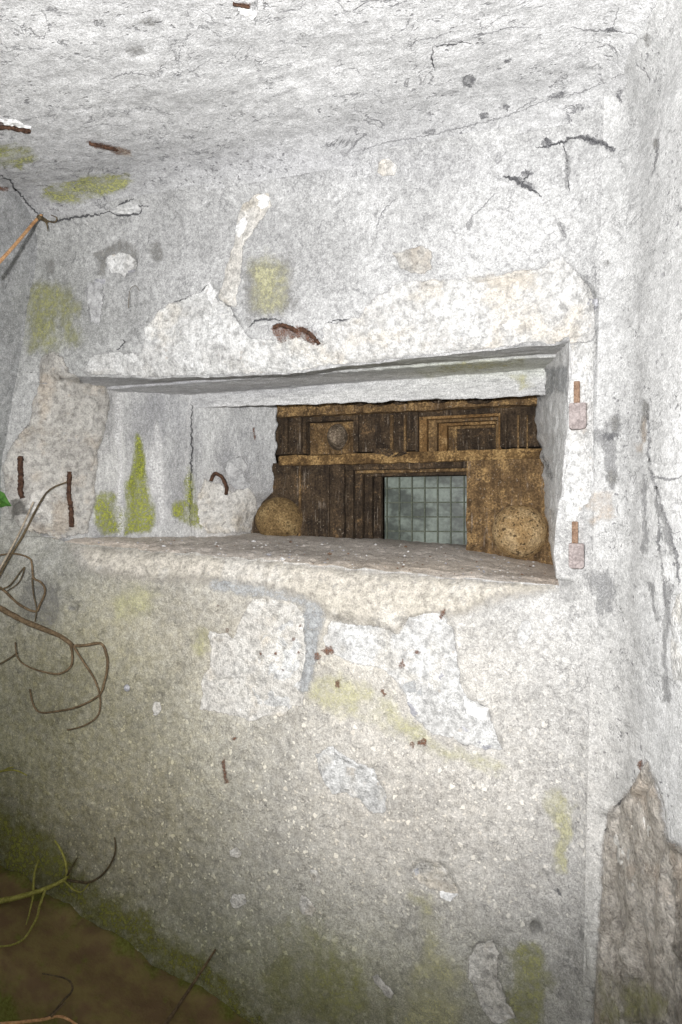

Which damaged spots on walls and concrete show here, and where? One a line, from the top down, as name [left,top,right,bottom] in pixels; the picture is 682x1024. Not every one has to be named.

crack [0,175,149,222]
corrosion [87,141,130,155]
crack [466,135,616,230]
corrosion [272,323,321,346]
spalling [2,193,599,540]
damp [114,393,124,536]
damp [148,426,166,524]
spalling [593,760,682,1024]